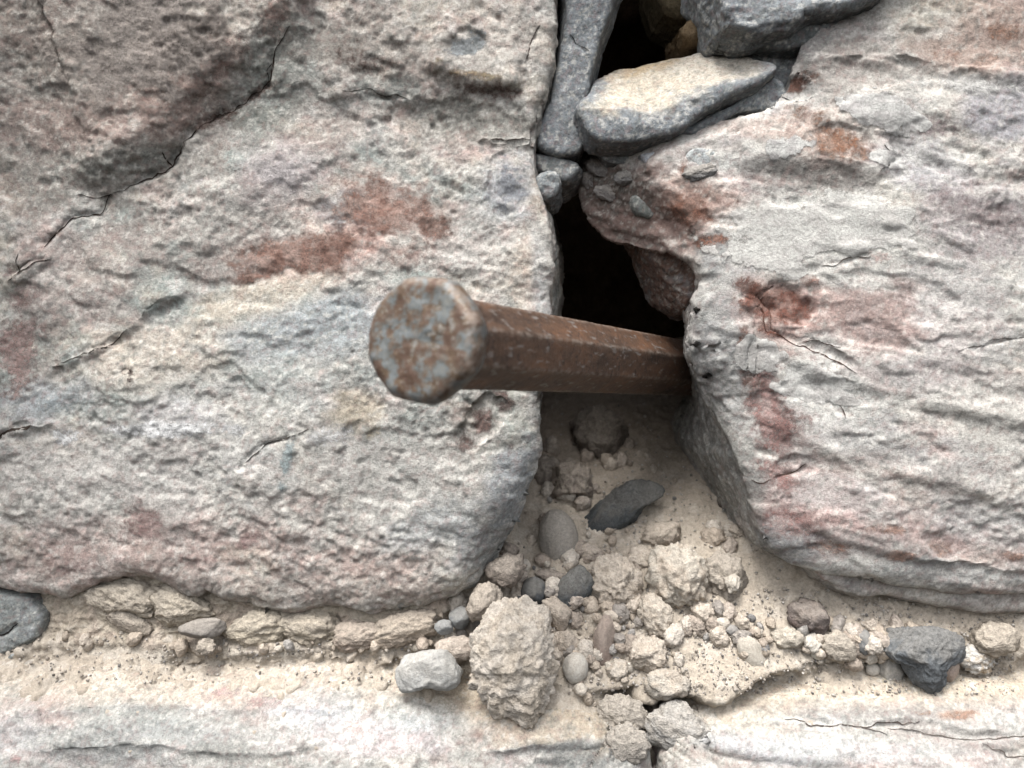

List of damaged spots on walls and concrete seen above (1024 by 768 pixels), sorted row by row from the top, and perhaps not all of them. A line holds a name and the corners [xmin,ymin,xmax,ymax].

crack [8,29,288,281]
crack [52,329,127,367]
crack [742,285,854,372]
crack [246,429,308,462]
crack [785,719,1024,758]